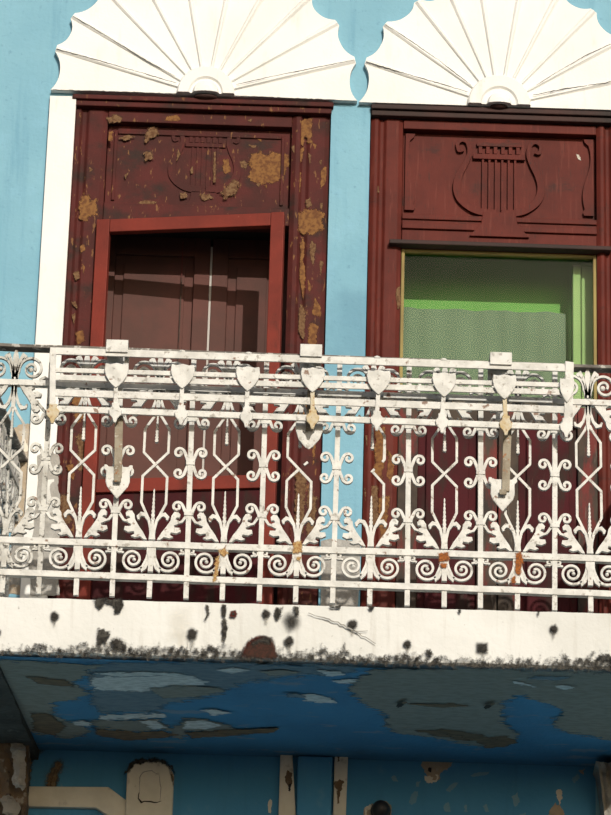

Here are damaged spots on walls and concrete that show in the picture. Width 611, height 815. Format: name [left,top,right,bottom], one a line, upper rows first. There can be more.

peeling [106,114,159,161]
peeling [201,118,327,201]
peeling [298,198,325,344]
corrosion [213,548,229,582]
corrosion [292,540,302,561]
corrosion [439,552,450,568]
corrosion [511,552,523,583]
damp [94,597,124,613]
damp [1,604,611,671]
peeling [0,659,278,741]
peeling [316,667,611,748]
spalling [0,743,26,815]